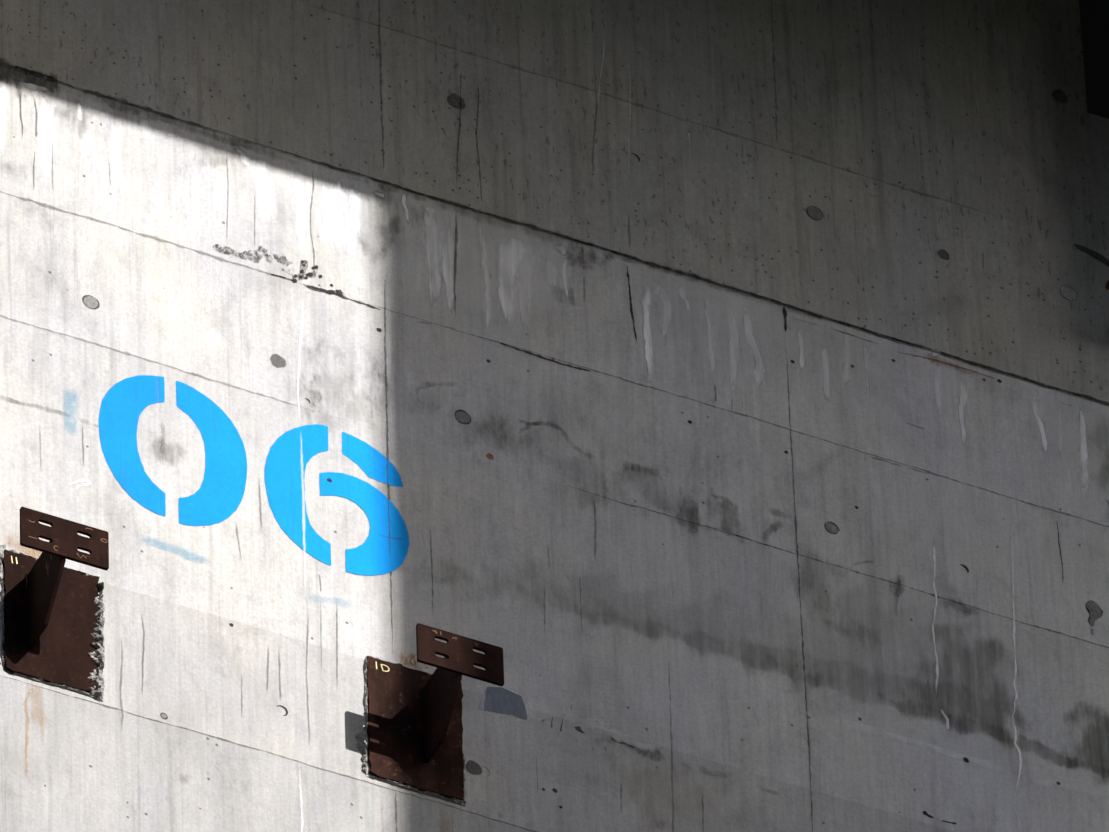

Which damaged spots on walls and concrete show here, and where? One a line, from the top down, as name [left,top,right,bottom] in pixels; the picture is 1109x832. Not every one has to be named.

leakage [0,58,57,158]
spalling [293,260,344,296]
leakage [322,182,359,255]
leakage [425,212,458,309]
efflorescence [480,236,532,327]
leakage [1080,411,1088,486]